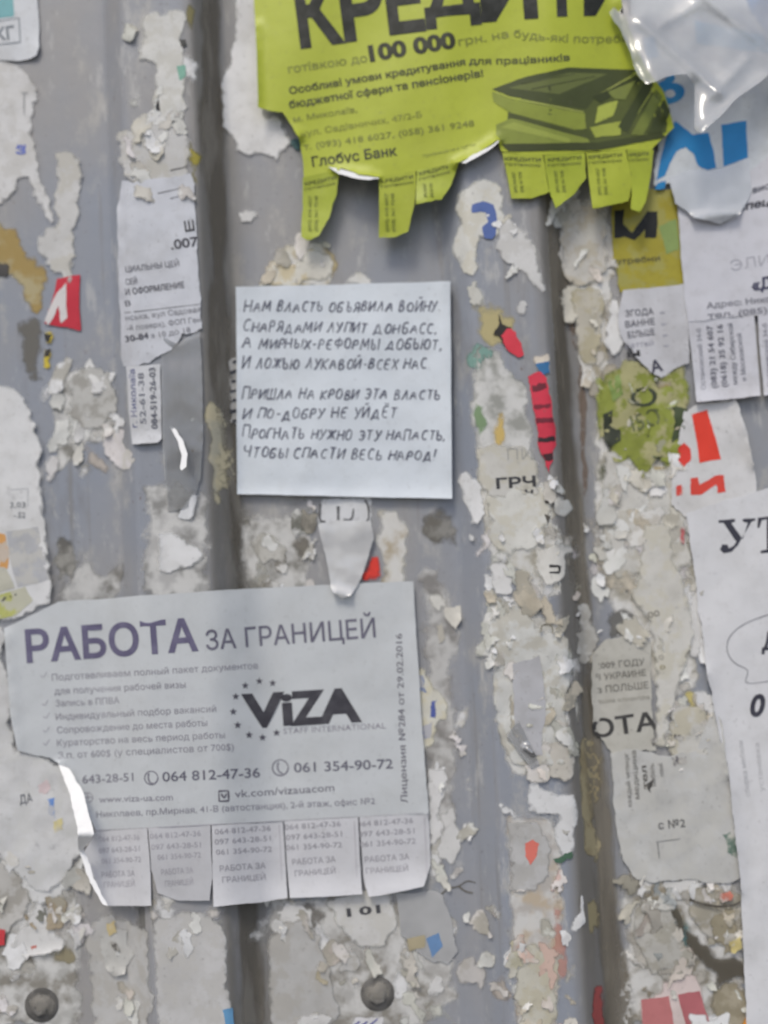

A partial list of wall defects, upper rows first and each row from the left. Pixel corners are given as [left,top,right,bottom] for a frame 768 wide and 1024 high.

peeling [122,23,138,42]
peeling [183,56,197,79]
peeling [122,86,187,203]
peeling [43,357,135,476]
peeling [476,452,689,680]
peeling [551,869,568,892]
peeling [2,933,36,981]
peeling [24,857,141,1024]
peeling [477,919,576,1015]